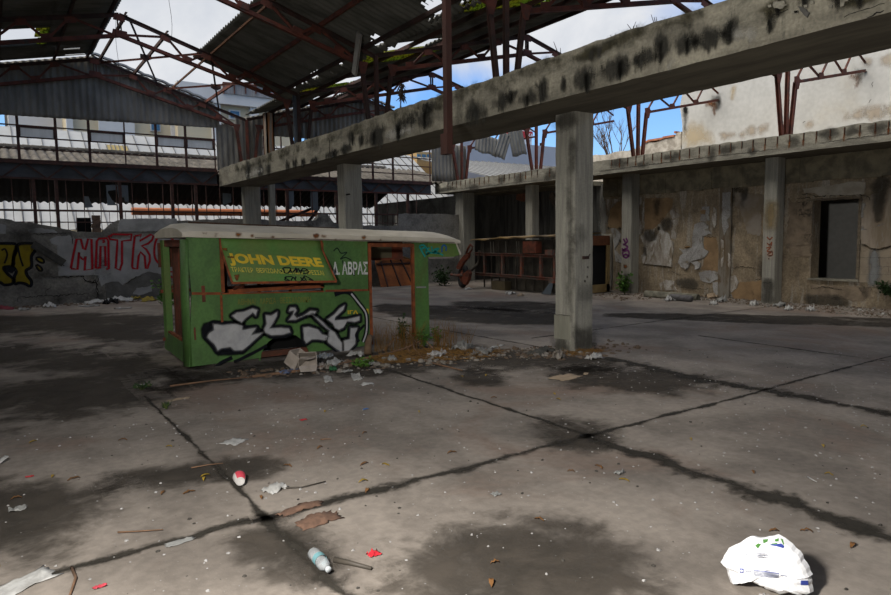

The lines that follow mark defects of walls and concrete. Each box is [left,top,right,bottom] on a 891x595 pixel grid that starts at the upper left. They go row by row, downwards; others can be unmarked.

water stain [561,11,754,93]
water stain [761,0,787,31]
water stain [834,0,871,9]
water stain [235,94,443,179]
peeling [639,191,764,300]